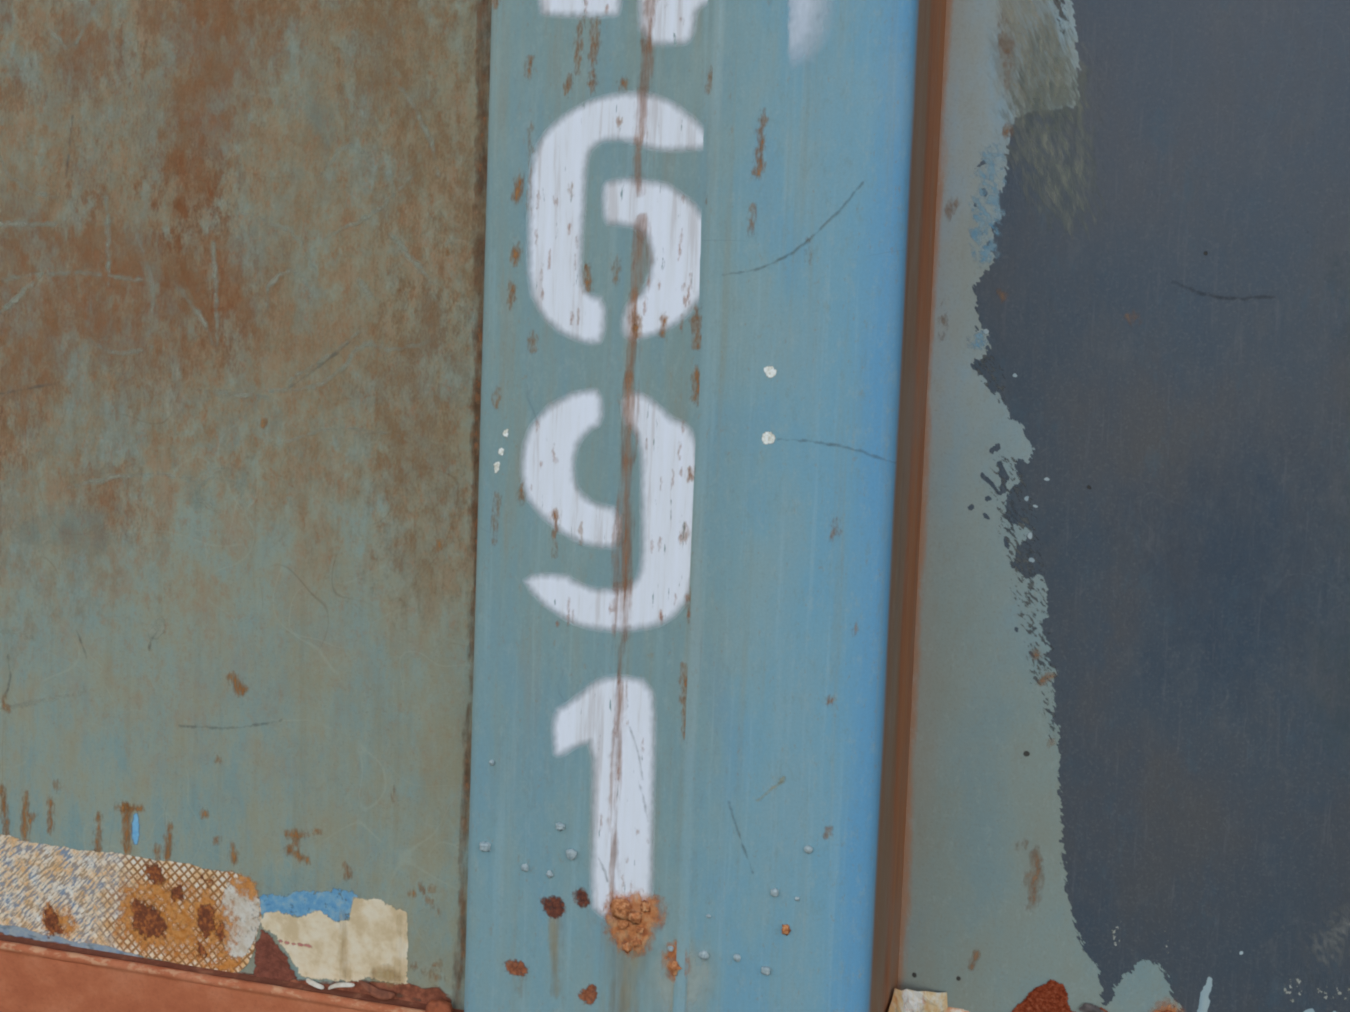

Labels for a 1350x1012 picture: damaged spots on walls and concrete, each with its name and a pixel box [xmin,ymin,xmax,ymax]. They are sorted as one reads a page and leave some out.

corrosion [477,0,498,196]
corrosion [471,320,500,634]
peeling [991,456,1057,740]
corrosion [0,785,53,839]
corrosion [120,803,142,853]
corrosion [0,903,75,945]
corrosion [113,825,466,1004]
peeling [259,888,358,922]
corrosion [540,888,590,919]
corrosion [606,893,662,952]
corrosion [664,942,677,980]
peeling [1012,980,1108,1012]